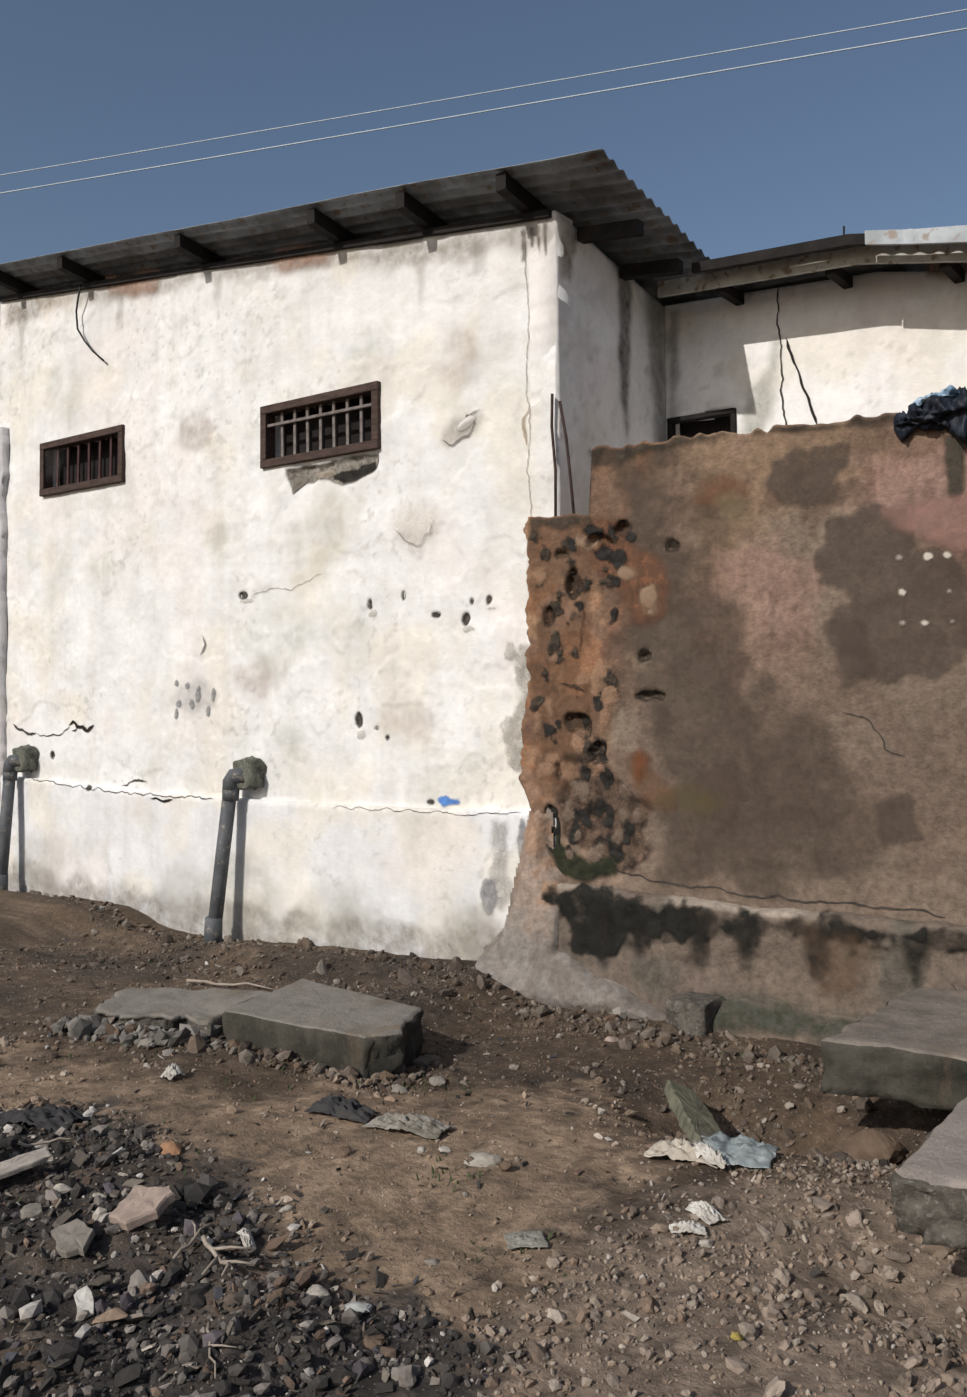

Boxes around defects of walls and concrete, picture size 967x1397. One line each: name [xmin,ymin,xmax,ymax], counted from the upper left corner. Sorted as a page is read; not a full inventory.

flaking render [286,453,379,494]
crack [522,229,532,517]
leakage [619,279,631,413]
crack [776,284,817,425]
leakage [851,416,889,424]
leakage [944,435,964,499]
leakage [815,503,967,681]
crack [13,720,93,737]
crack [25,777,213,803]
flaking render [502,518,680,871]
leakage [542,835,767,963]
leakage [786,909,967,977]